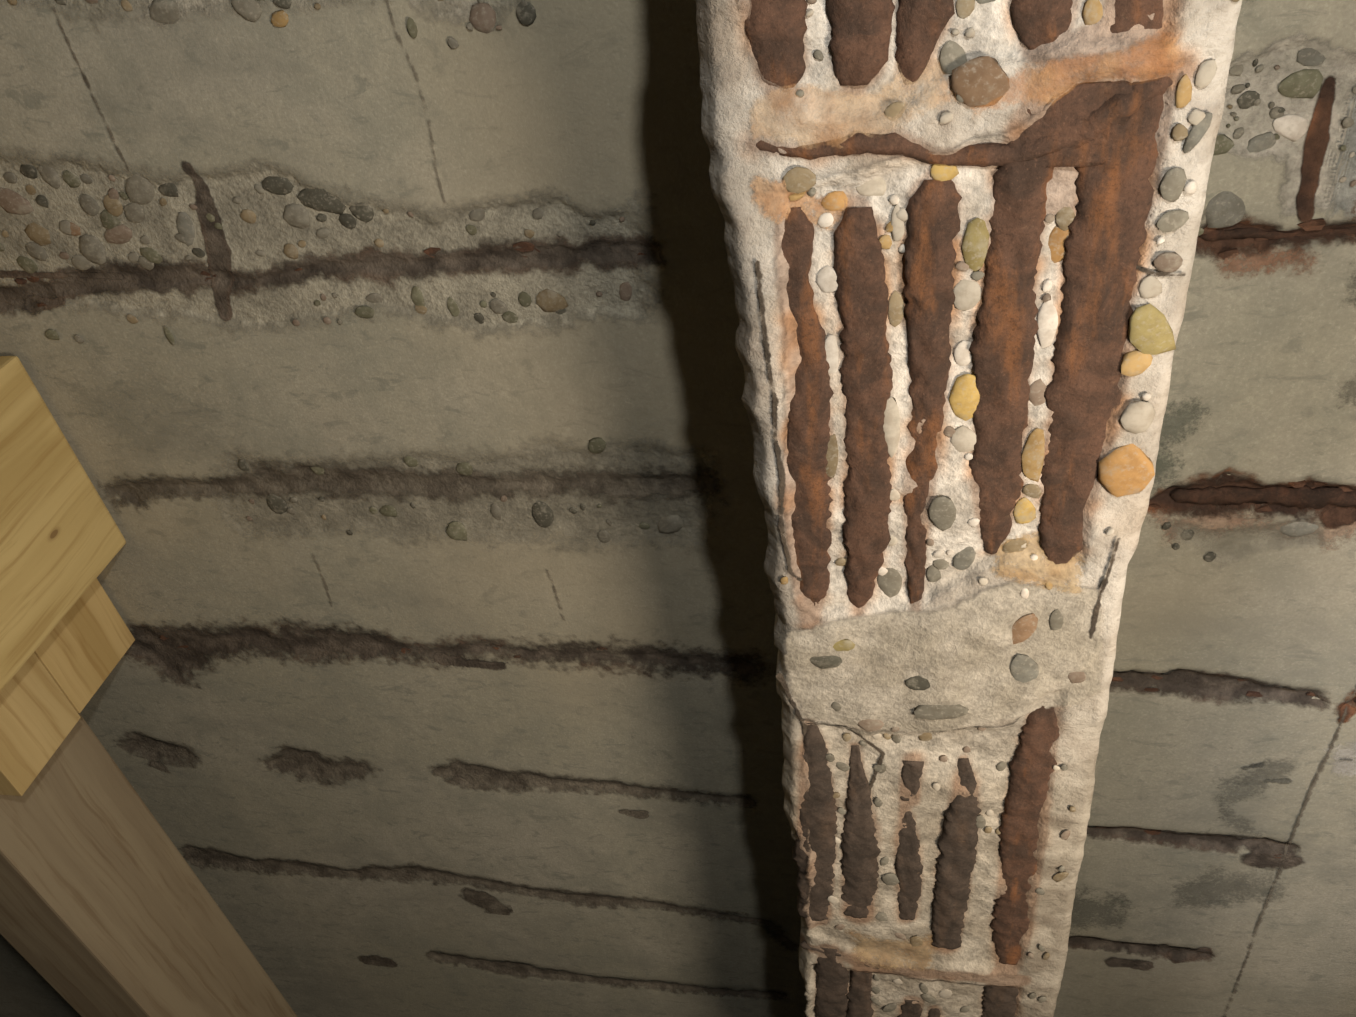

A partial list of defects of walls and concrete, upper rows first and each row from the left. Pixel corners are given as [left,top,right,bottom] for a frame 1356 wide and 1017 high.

spalling [0,0,353,27]
spalling [407,0,537,49]
spalling [785,0,1184,127]
corrosion [750,177,845,230]
spalling [0,148,660,345]
corrosion [1218,246,1316,278]
spalling [774,34,1356,1017]
corrosion [993,533,1083,593]
crack [1224,691,1356,1017]
corrosion [849,931,937,971]